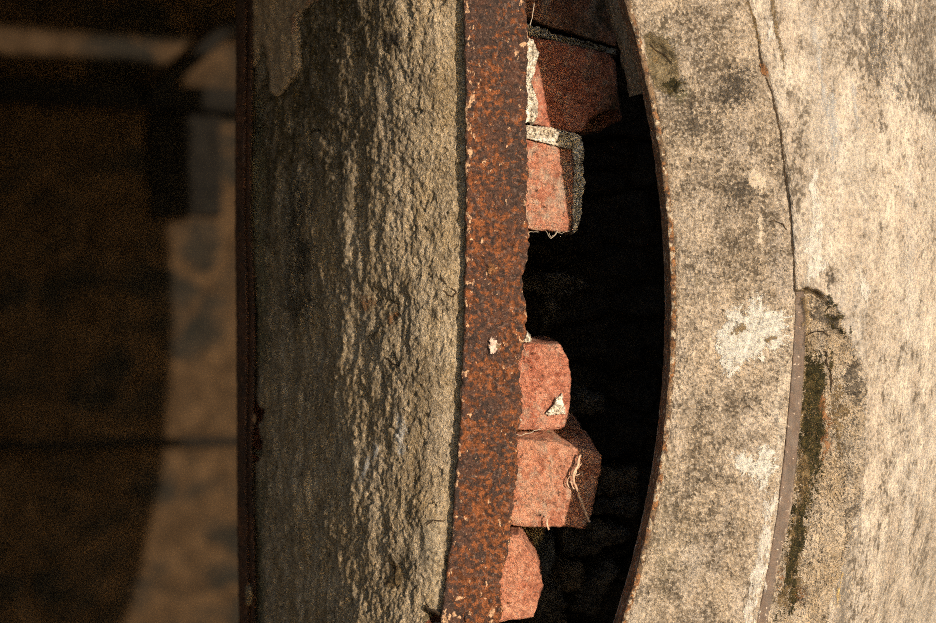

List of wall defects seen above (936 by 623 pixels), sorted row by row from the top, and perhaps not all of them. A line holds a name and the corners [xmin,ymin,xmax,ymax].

crack [754,0,796,294]